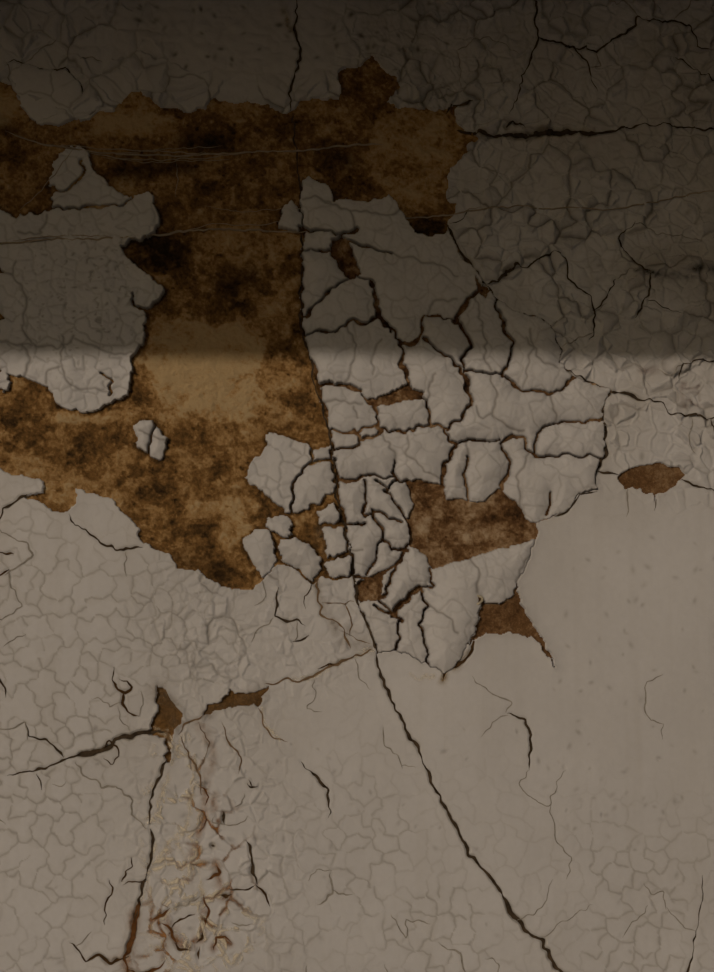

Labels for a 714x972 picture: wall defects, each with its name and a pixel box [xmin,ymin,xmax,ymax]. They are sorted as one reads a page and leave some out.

crack [446,0,714,141]
peeling [0,56,612,674]
crack [448,212,714,517]
crack [0,494,34,646]
crack [70,517,142,577]
crack [252,0,591,972]
peeling [617,463,685,497]
peeling [150,685,183,763]
peeling [204,686,269,715]
crack [0,671,202,972]
crack [229,842,270,906]
crack [624,875,703,972]